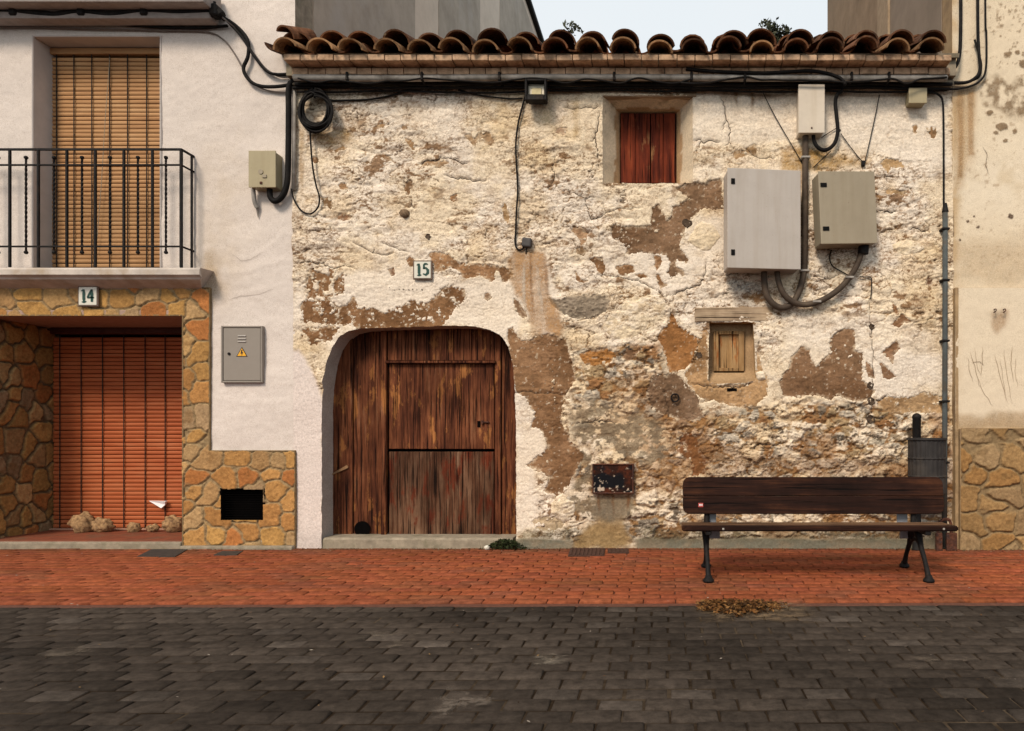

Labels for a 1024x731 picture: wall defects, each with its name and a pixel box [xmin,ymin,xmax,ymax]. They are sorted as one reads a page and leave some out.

flaking render [300,234,512,346]
flaking render [571,179,724,289]
flaking render [507,327,642,496]
flaking render [646,304,950,424]